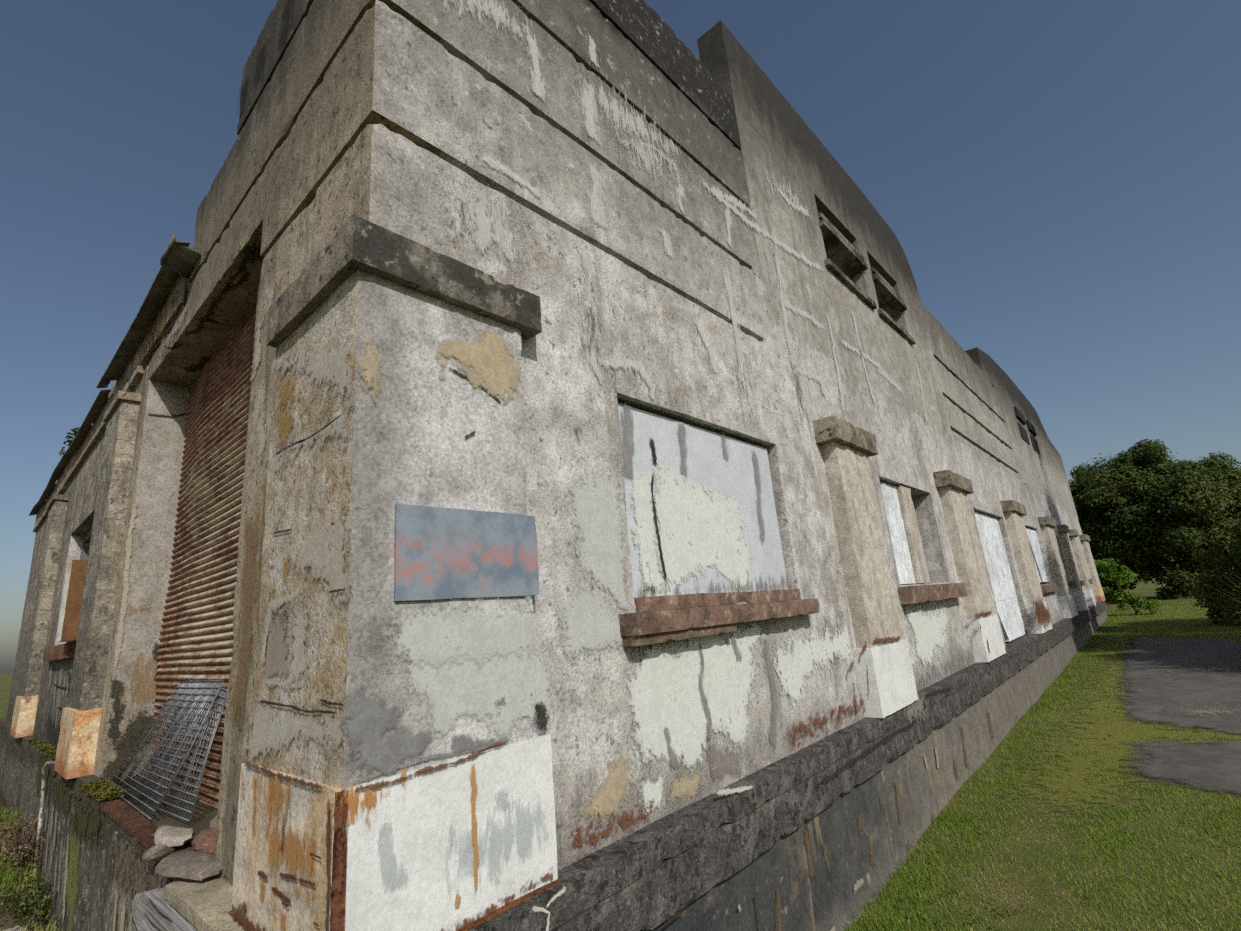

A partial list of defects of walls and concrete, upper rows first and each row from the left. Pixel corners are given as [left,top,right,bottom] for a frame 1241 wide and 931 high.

peeling [251,278,381,479]
spalling [436,328,521,404]
peeling [558,462,752,663]
peeling [249,515,552,783]
peeling [581,621,761,824]
peeling [773,625,853,708]
rust [787,636,900,748]
leakage [902,645,974,723]
rust [228,742,505,931]
rust [569,801,654,858]
rust [441,872,560,931]
leakage [532,887,566,931]